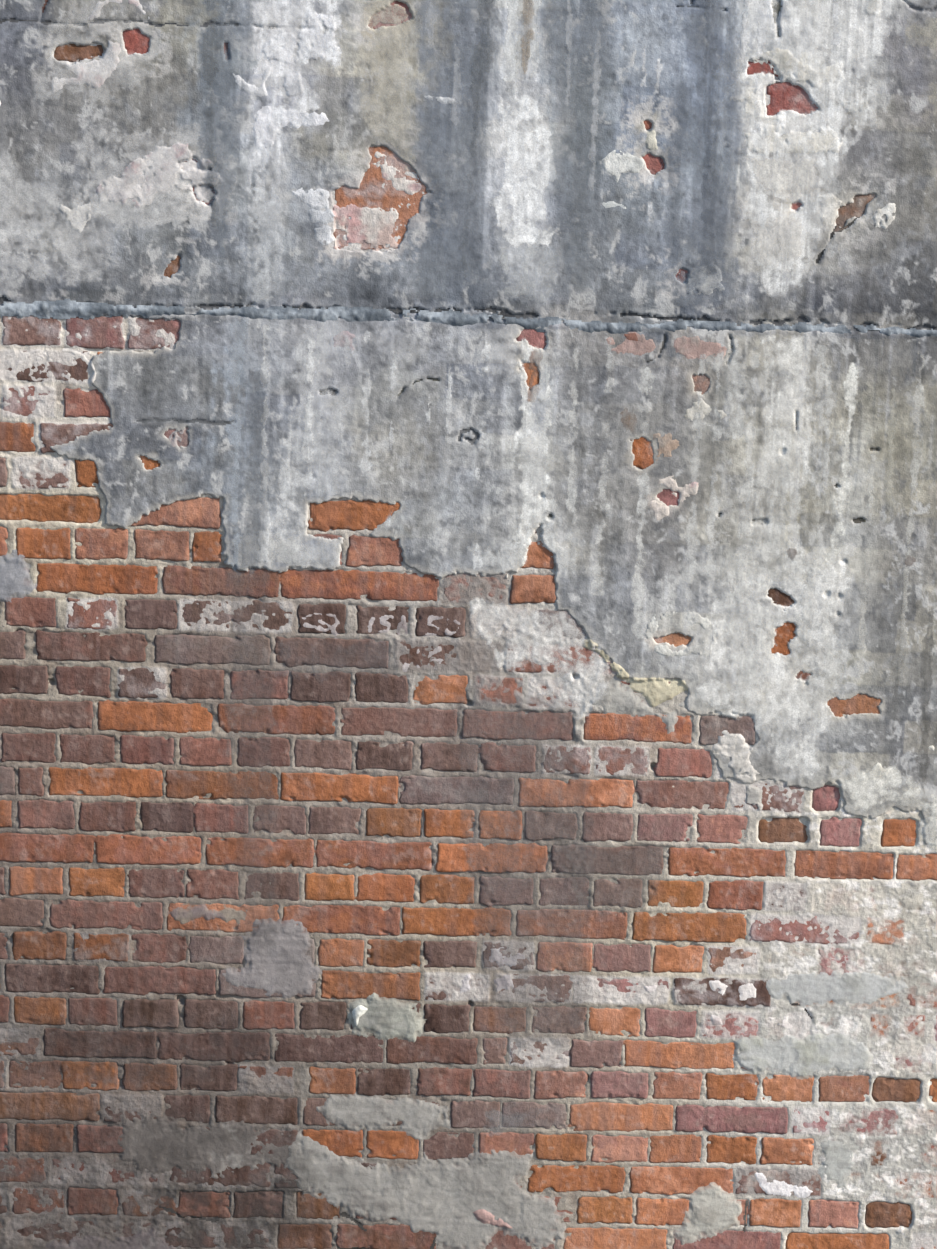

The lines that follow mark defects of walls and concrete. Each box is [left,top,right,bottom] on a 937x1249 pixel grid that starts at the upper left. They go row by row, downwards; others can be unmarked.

crack [908,4,937,12]
damp [69,0,346,305]
spalling [292,146,430,253]
damp [363,0,557,295]
damp [563,0,604,218]
spalling [730,48,843,154]
damp [481,334,491,372]
damp [229,318,372,570]
spalling [0,494,101,523]
flaking render [711,730,808,843]
spalling [872,1077,937,1102]
spalling [786,1201,912,1249]